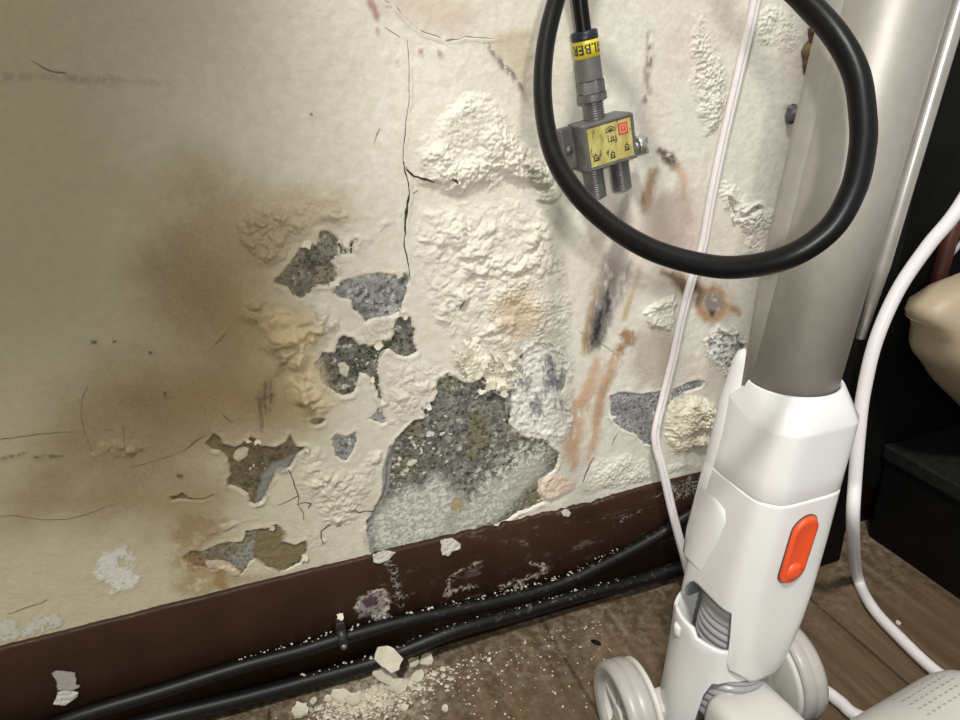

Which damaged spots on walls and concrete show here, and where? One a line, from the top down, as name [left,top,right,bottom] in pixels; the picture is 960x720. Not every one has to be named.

crack [379,0,503,277]
peeling [206,434,310,503]
water stain [259,306,331,420]
spalling [274,231,417,423]
spalling [367,337,575,552]
corrosion [567,361,613,467]
corrosion [617,330,636,351]
spalling [608,380,703,445]
corrosion [661,270,740,321]
spalling [183,524,308,590]